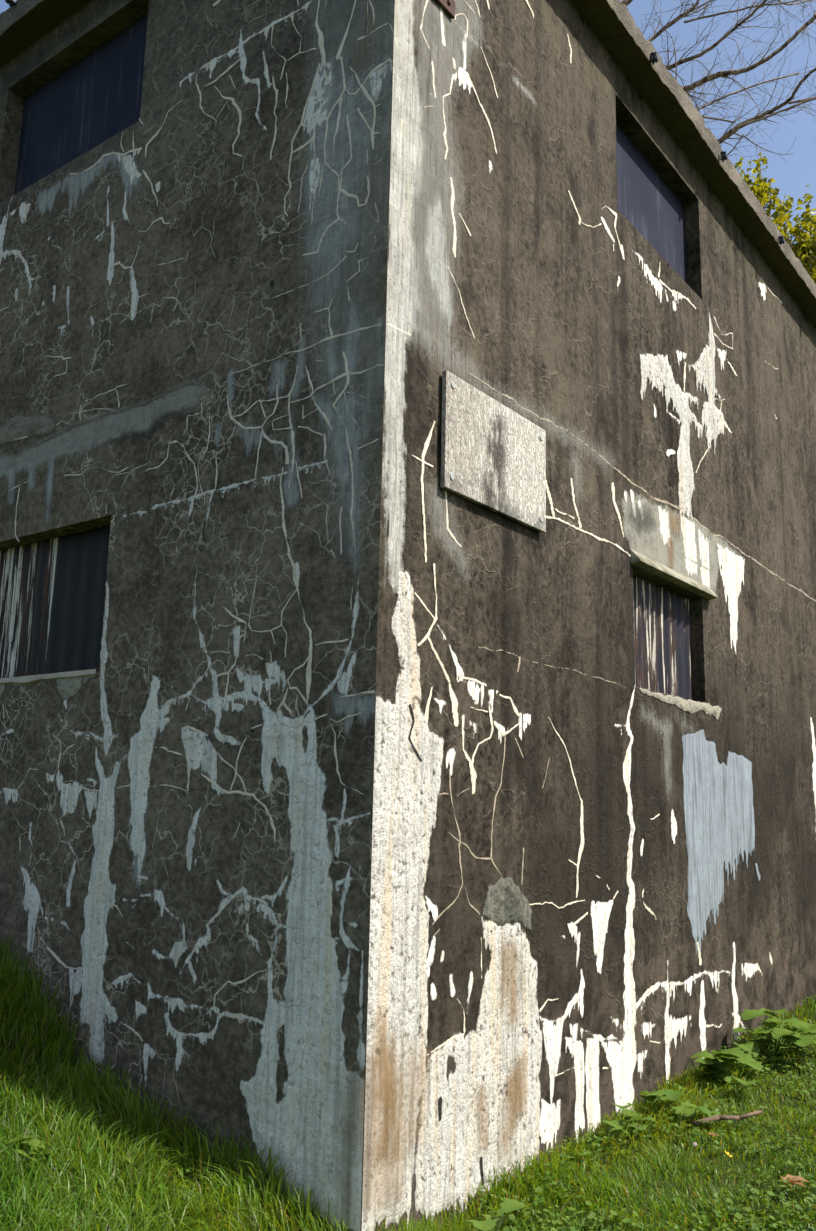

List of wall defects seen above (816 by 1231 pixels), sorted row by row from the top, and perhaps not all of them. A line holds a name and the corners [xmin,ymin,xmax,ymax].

water stain [37,0,327,323]
crack [161,467,366,745]
crack [409,421,619,936]
spalling [640,688,722,720]
water stain [186,807,201,872]
crack [111,875,288,1077]
water stain [246,912,287,1143]
rust [380,1026,400,1157]
peeling [427,936,435,977]
peeling [425,896,438,921]
spalling [482,876,532,930]
crack [640,809,677,856]